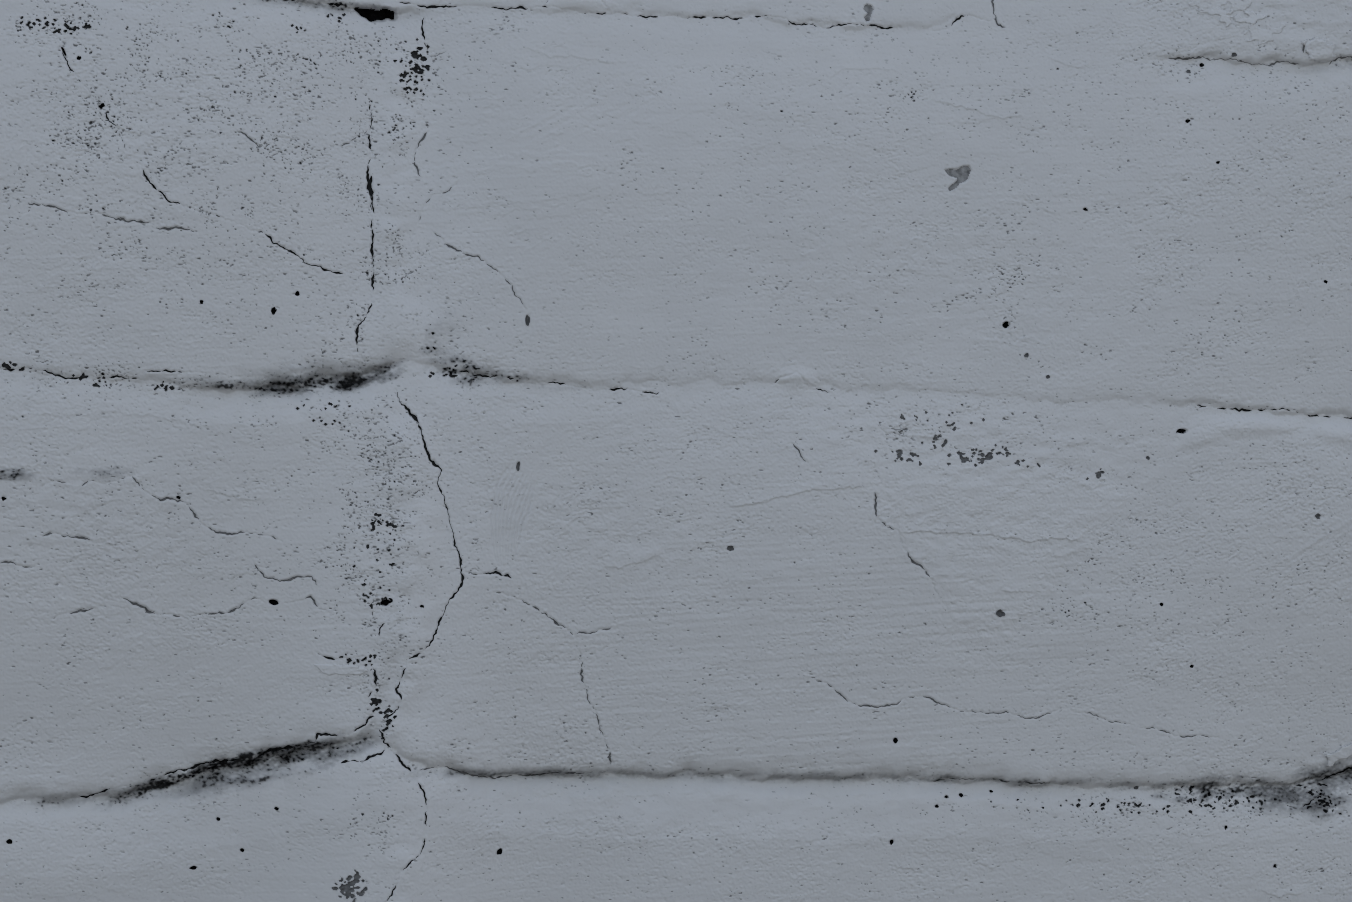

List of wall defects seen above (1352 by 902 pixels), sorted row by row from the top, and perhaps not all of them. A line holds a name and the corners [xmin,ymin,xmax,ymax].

crack [400,2,456,57]
crack [693,15,893,29]
crack [63,54,220,232]
peeling [945,166,971,191]
crack [414,133,523,304]
crack [462,370,514,380]
crack [121,478,317,617]
crack [266,392,612,901]
crack [818,681,1050,719]
crack [80,759,232,798]